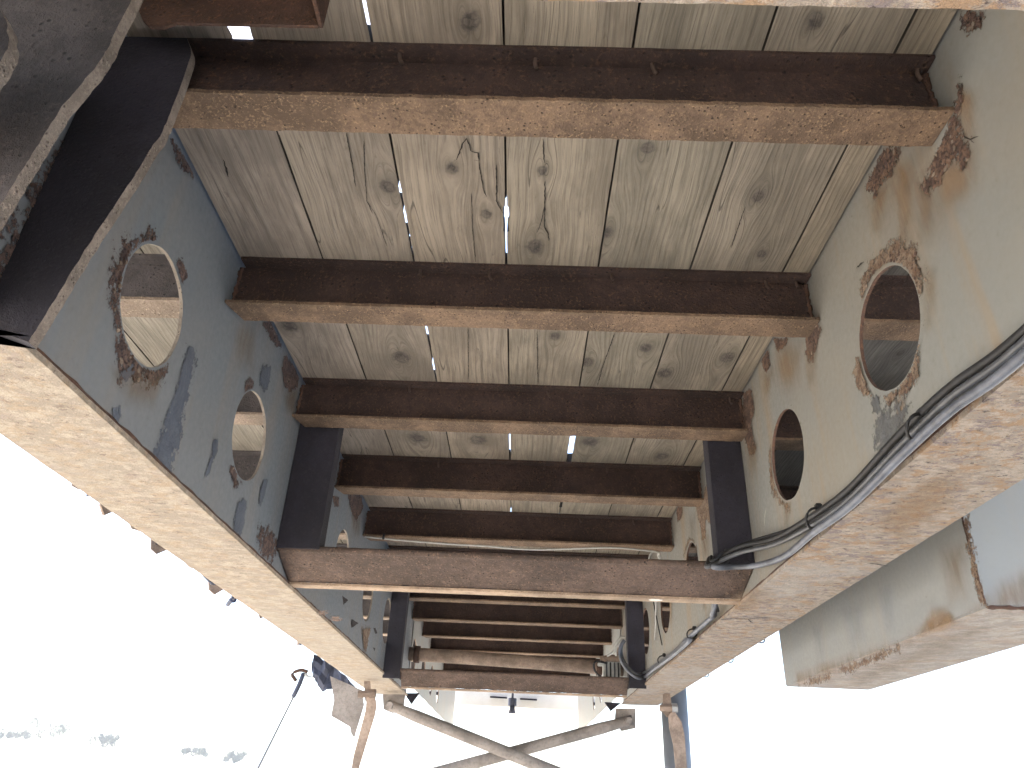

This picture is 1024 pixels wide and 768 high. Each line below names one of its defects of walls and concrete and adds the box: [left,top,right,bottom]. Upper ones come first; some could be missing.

rust [959,10,986,37]
crack [456,138,503,262]
crack [537,140,549,239]
rust [866,146,901,199]
rust [920,76,972,197]
peeling [859,237,927,299]
peeling [106,225,198,472]
peeling [851,344,920,452]
peeling [205,439,218,477]
rust [256,524,277,563]
rust [964,514,989,609]
rust [798,641,901,689]